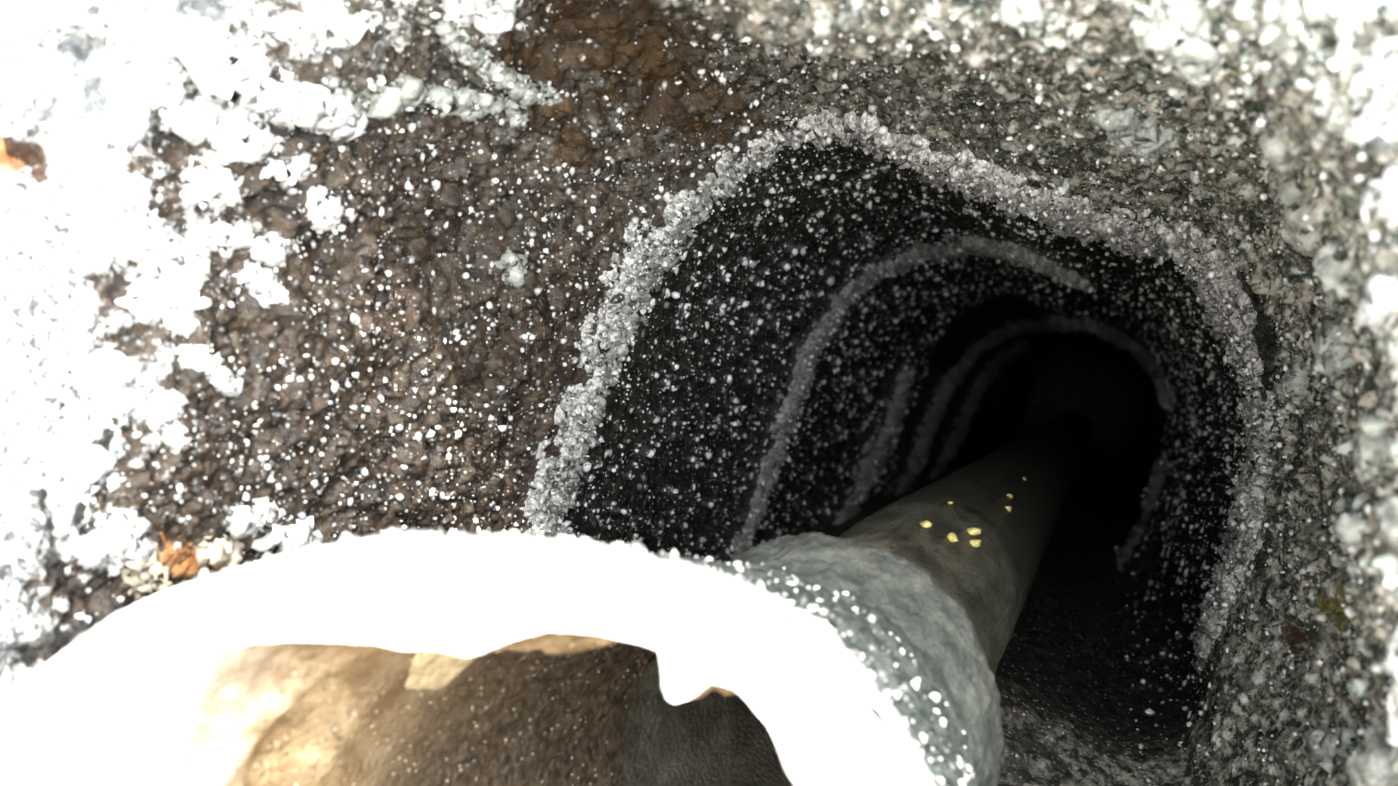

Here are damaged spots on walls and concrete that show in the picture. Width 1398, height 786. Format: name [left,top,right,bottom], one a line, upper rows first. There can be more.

flaking render [992,0,1068,38]
flaking render [1128,0,1225,86]
flaking render [1262,0,1332,35]
rust [0,138,25,170]
flaking render [1092,108,1180,166]
flaking render [97,0,562,398]
flaking render [1257,124,1398,419]
flaking render [143,388,191,454]
flaking render [43,344,174,599]
flaking render [1332,388,1398,556]
flaking render [192,496,323,570]
peeling [405,650,478,689]